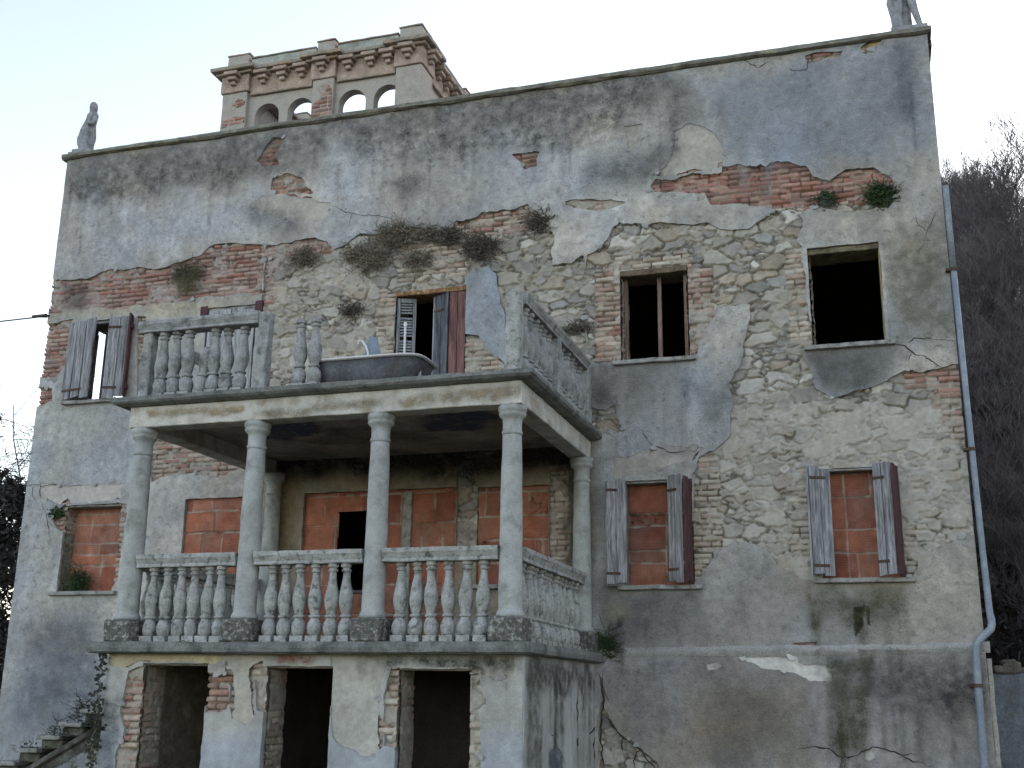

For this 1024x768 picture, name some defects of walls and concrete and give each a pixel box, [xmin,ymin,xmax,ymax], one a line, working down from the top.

spalling [39,124,974,584]
crack [897,337,952,367]
spalling [109,654,271,768]
flaking render [328,654,402,758]
leakage [527,657,595,768]
crack [551,670,655,768]
flaking render [739,642,839,682]
crack [795,746,929,768]
leakage [828,655,986,758]